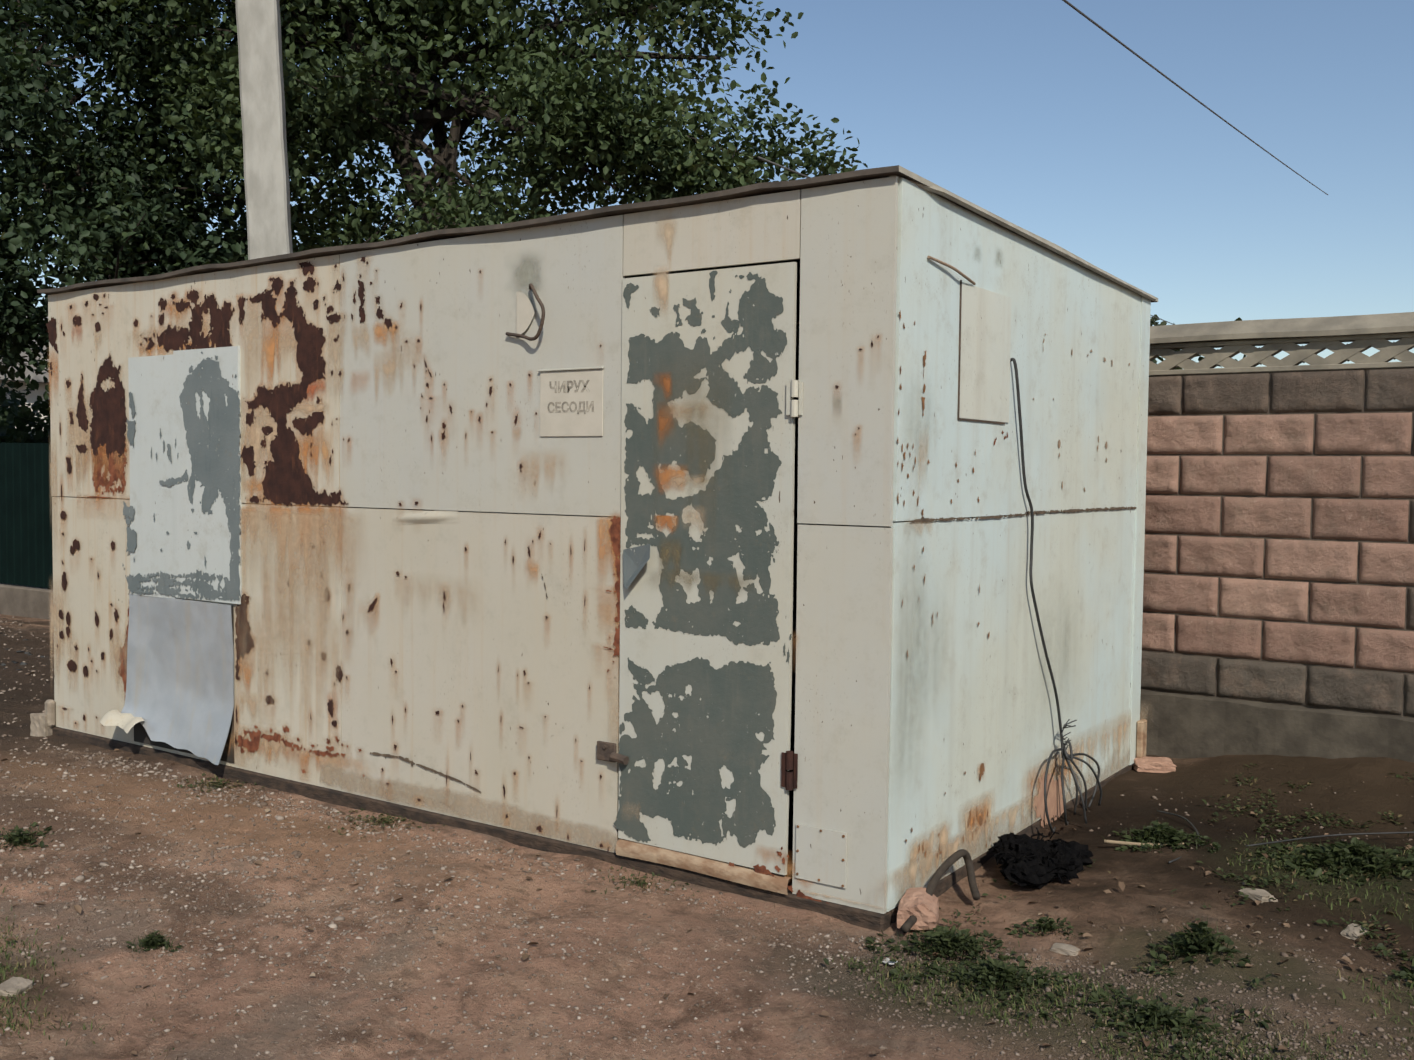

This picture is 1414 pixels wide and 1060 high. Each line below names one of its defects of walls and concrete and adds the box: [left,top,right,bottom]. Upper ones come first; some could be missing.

rust [46,294,129,696]
peeling [123,352,241,601]
rust [235,593,274,744]
rust [133,257,420,601]
rust [307,640,347,727]
rust [570,516,621,672]
peeling [613,270,792,848]
rust [905,723,1127,880]